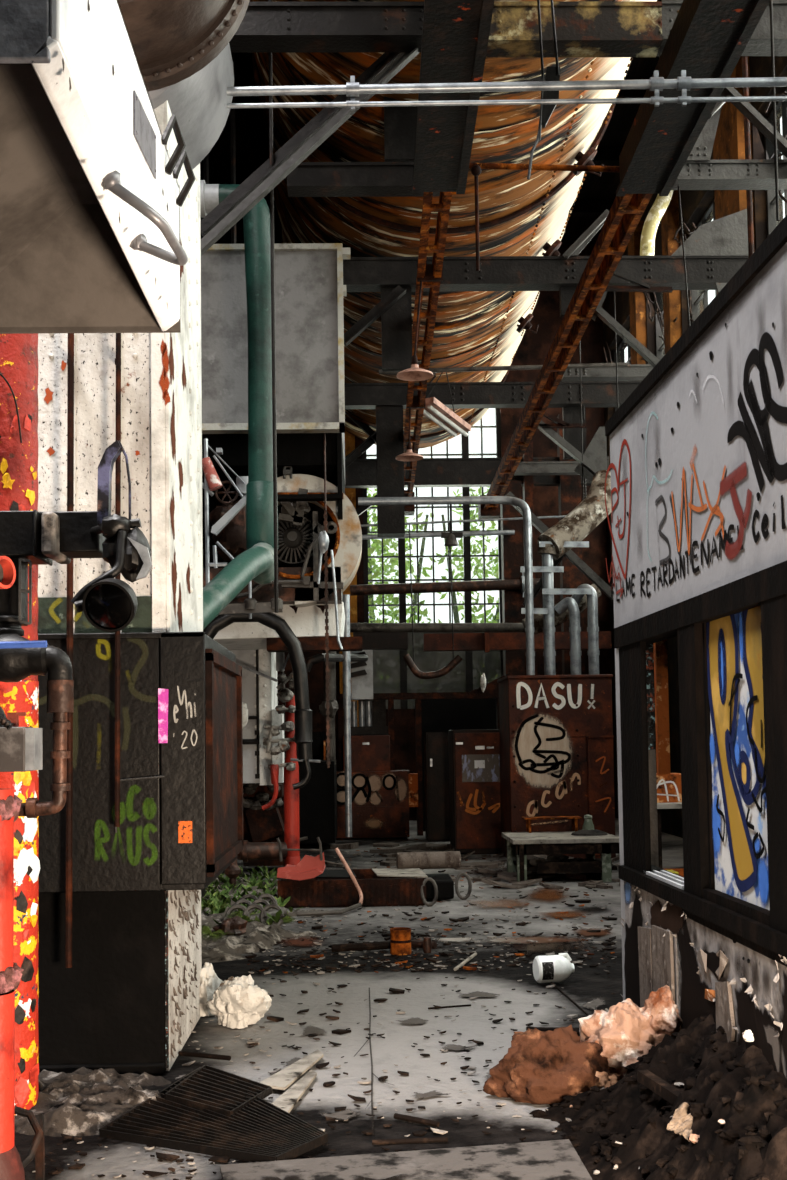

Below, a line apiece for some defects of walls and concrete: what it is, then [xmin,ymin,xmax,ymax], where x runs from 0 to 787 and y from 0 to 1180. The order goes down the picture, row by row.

corrosion [159,340,171,406]
peeling [619,886,787,1079]